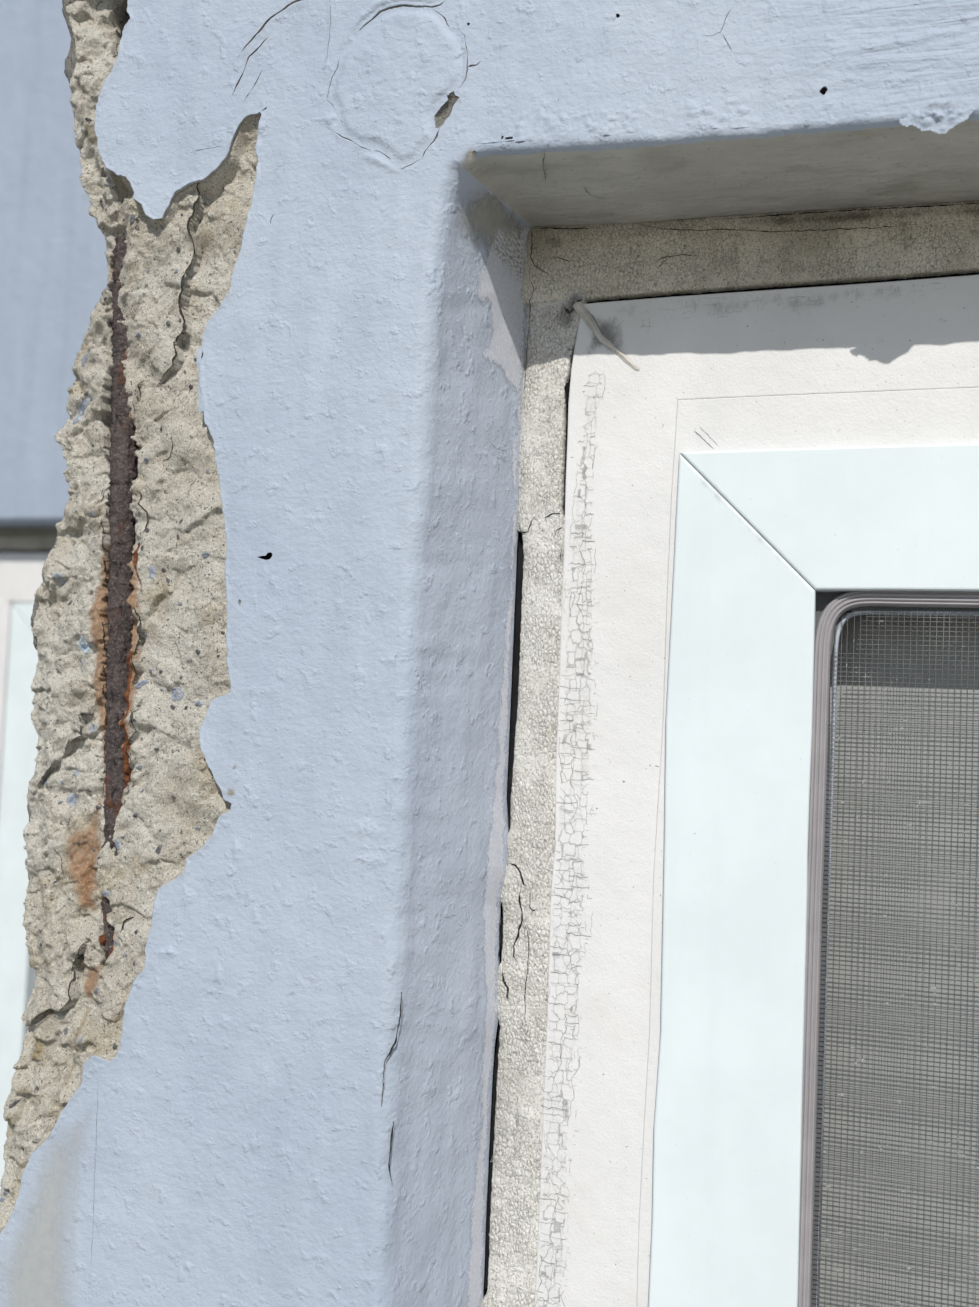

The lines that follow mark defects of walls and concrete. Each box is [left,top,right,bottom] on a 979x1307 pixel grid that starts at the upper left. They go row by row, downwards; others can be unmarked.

crack [233,0,480,169]
corrosion [91,543,142,798]
spalling [0,0,267,1251]
corrosion [69,819,98,907]
corrosion [85,915,114,996]
crack [485,349,605,1306]